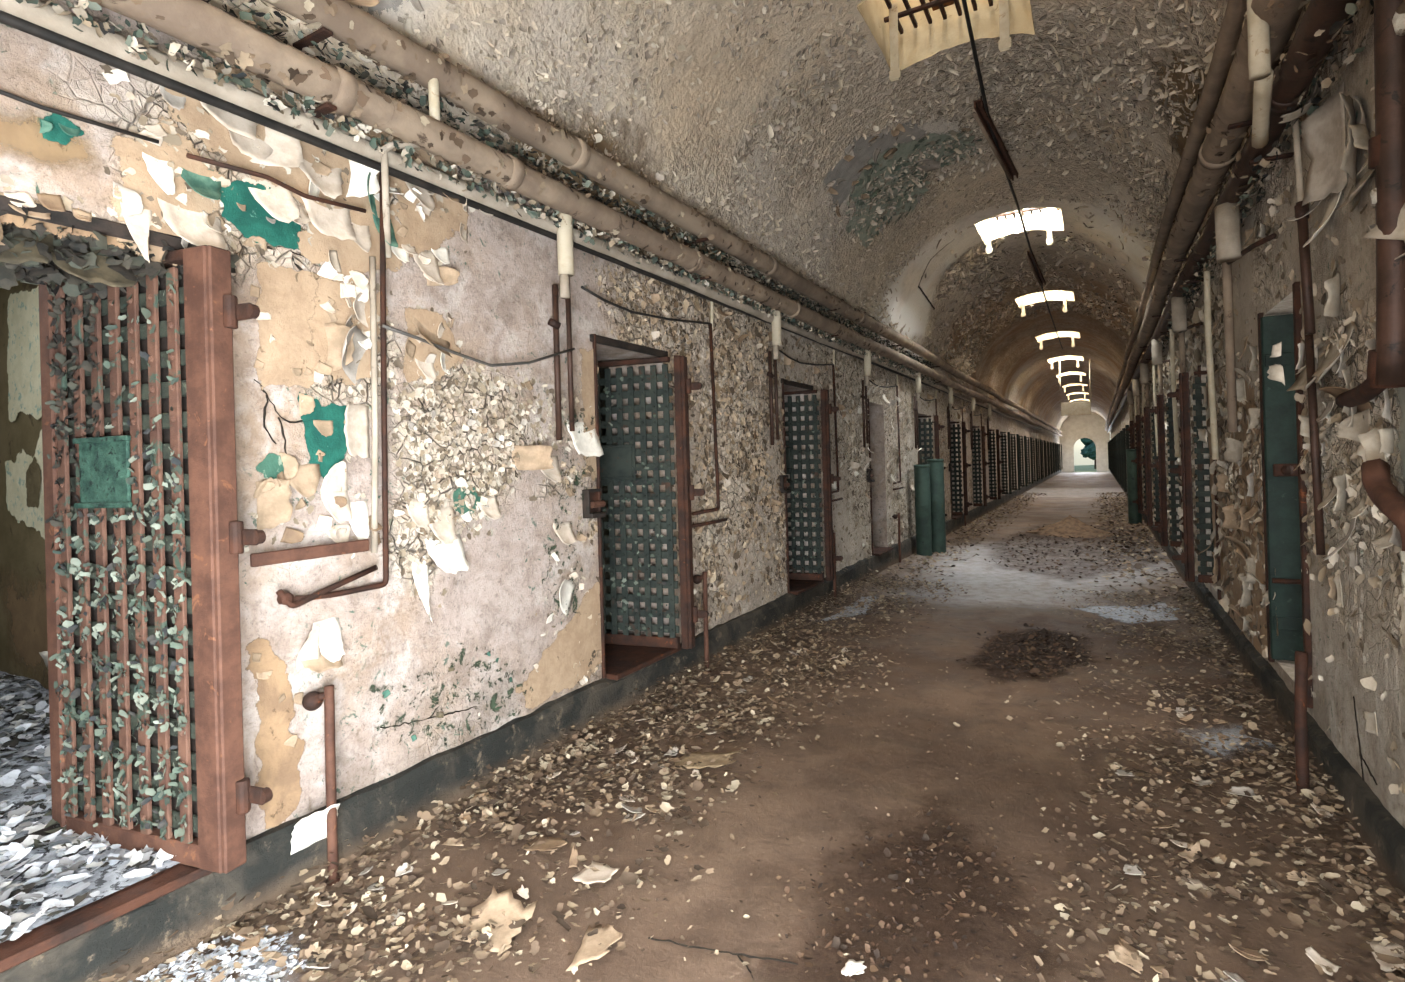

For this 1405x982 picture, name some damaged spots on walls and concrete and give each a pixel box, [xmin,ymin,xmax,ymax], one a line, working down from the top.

peeling [99,64,135,102]
peeling [139,349,179,385]